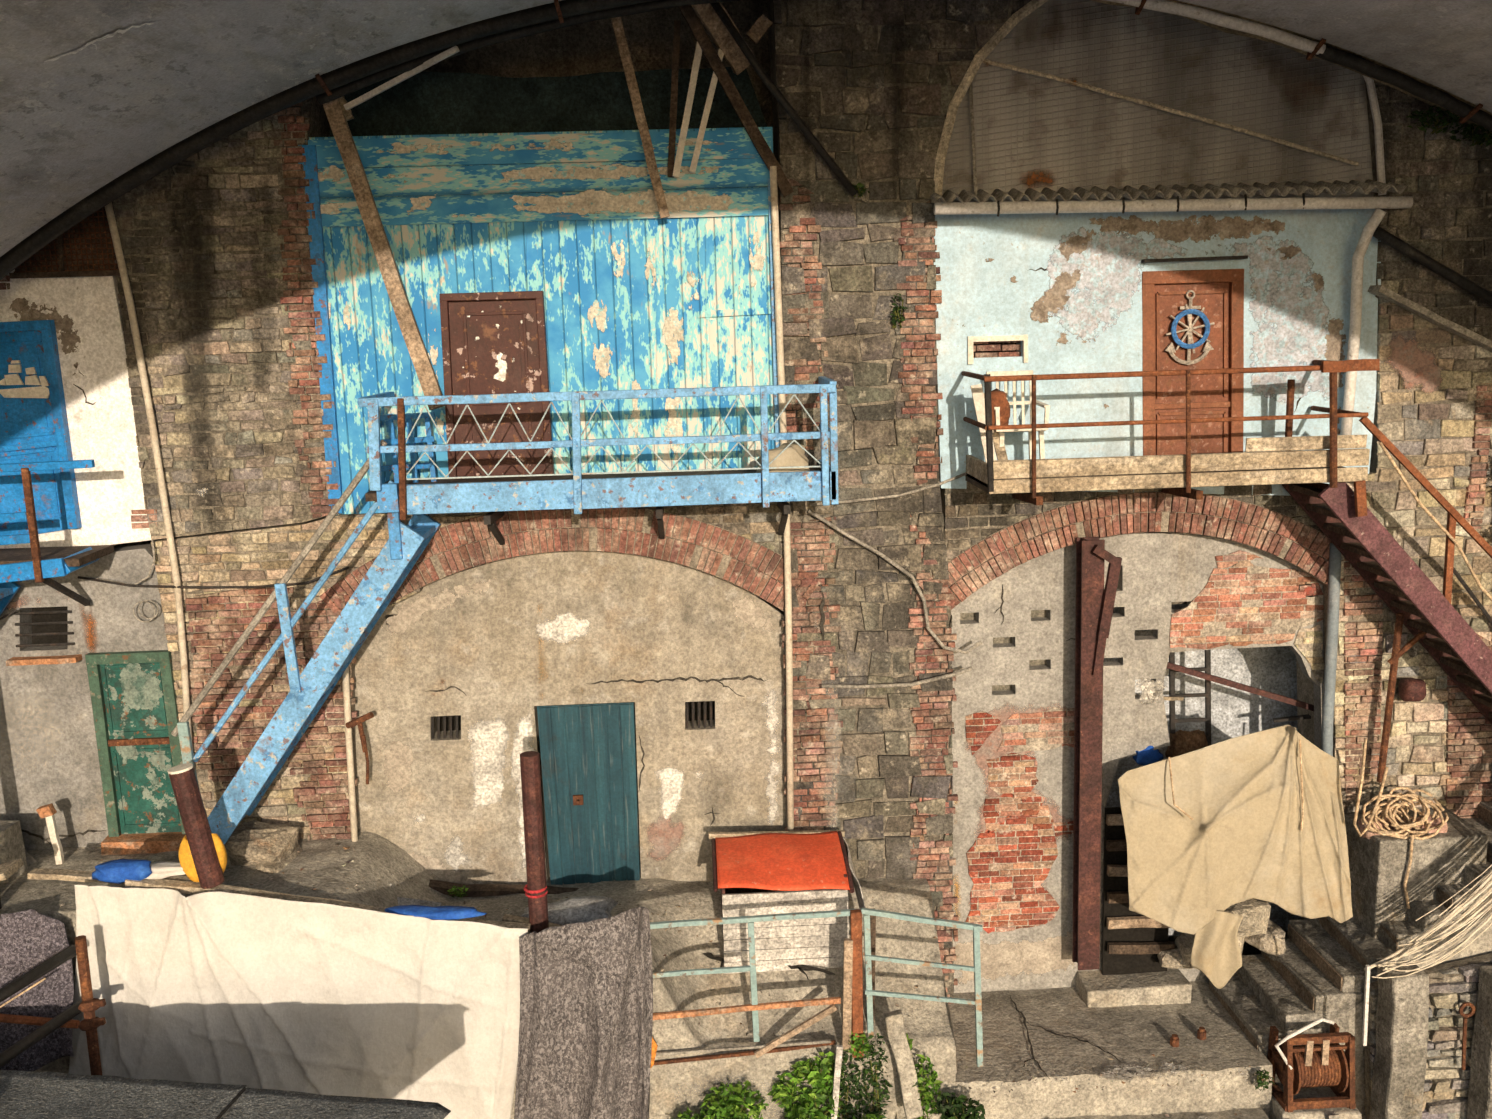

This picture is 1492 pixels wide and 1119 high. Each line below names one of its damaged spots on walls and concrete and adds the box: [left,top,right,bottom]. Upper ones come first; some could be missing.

peeling [470,137,733,217]
peeling [611,240,625,278]
peeling [0,275,81,375]
peeling [588,300,613,379]
peeling [662,271,703,365]
peeling [1030,214,1347,434]
peeling [494,353,520,410]
flaking render [1169,550,1325,684]
crack [426,686,466,695]
crack [586,675,768,696]
flaking render [953,705,1075,984]
crack [1010,996,1122,1078]